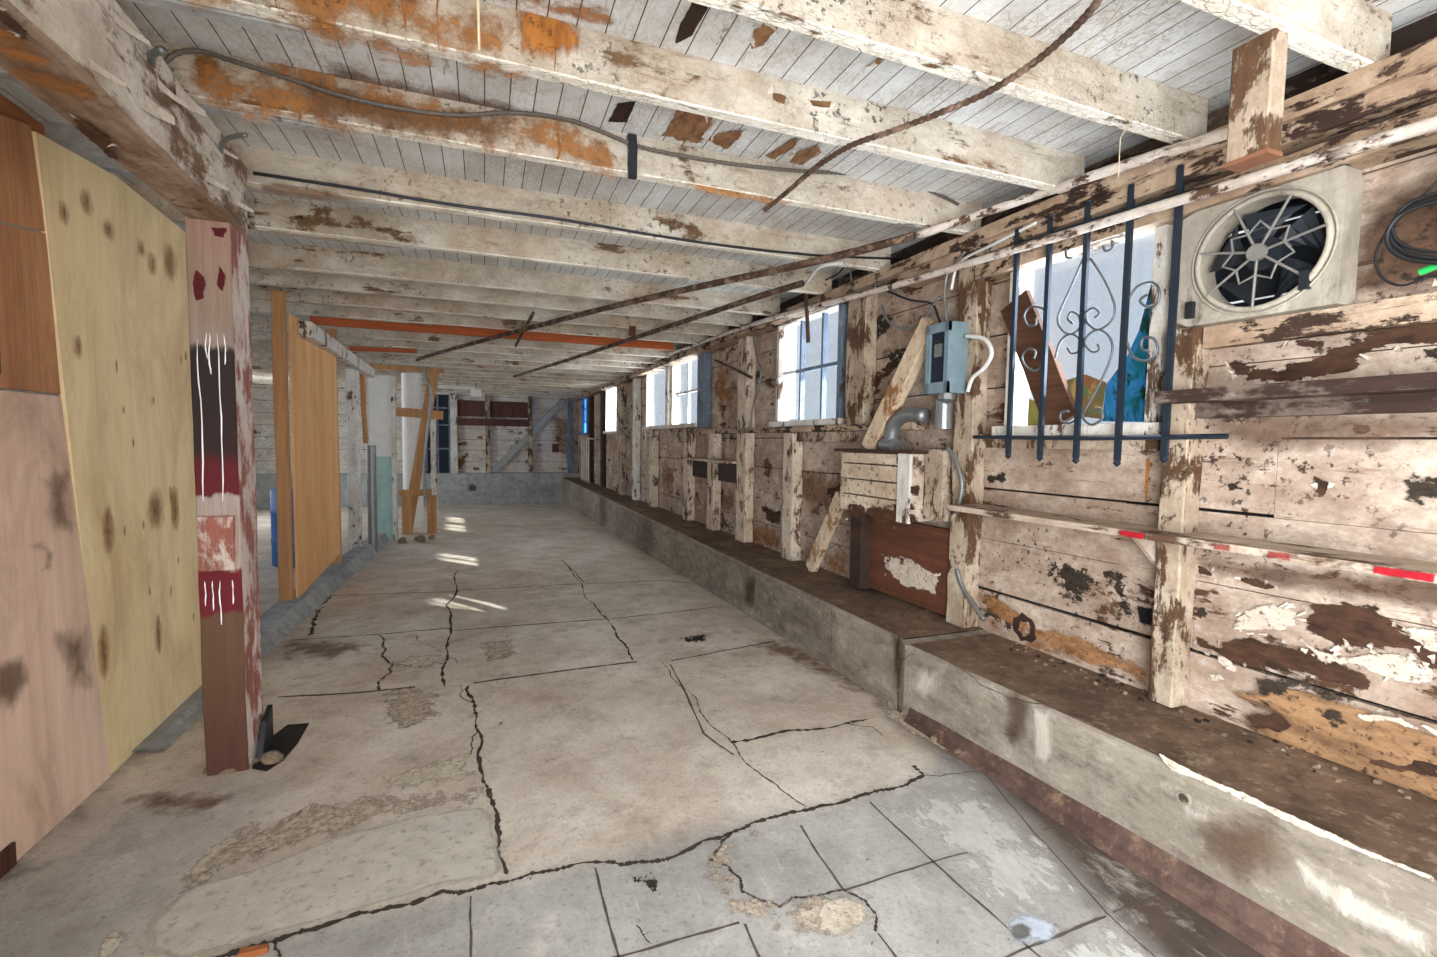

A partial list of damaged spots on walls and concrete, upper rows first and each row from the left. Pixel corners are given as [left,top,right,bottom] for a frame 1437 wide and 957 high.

peeling [744,24,778,65]
peeling [656,110,746,149]
peeling [761,137,821,165]
peeling [875,348,905,394]
peeling [1224,322,1437,382]
peeling [1311,476,1335,497]
peeling [882,554,941,594]
peeling [1193,566,1437,690]
leakage [0,663,23,702]
crack [950,662,1061,712]
peeling [1357,709,1437,737]
crack [214,561,980,957]